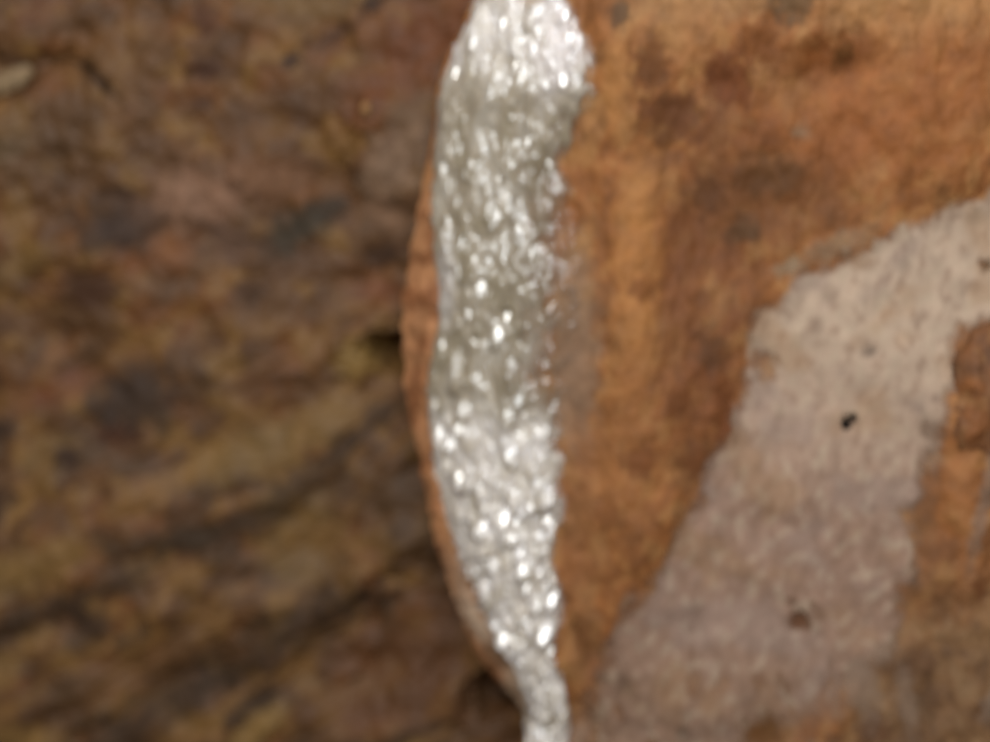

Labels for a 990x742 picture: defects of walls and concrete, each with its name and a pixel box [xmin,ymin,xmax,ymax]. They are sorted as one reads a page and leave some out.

spalling [841,414,857,429]